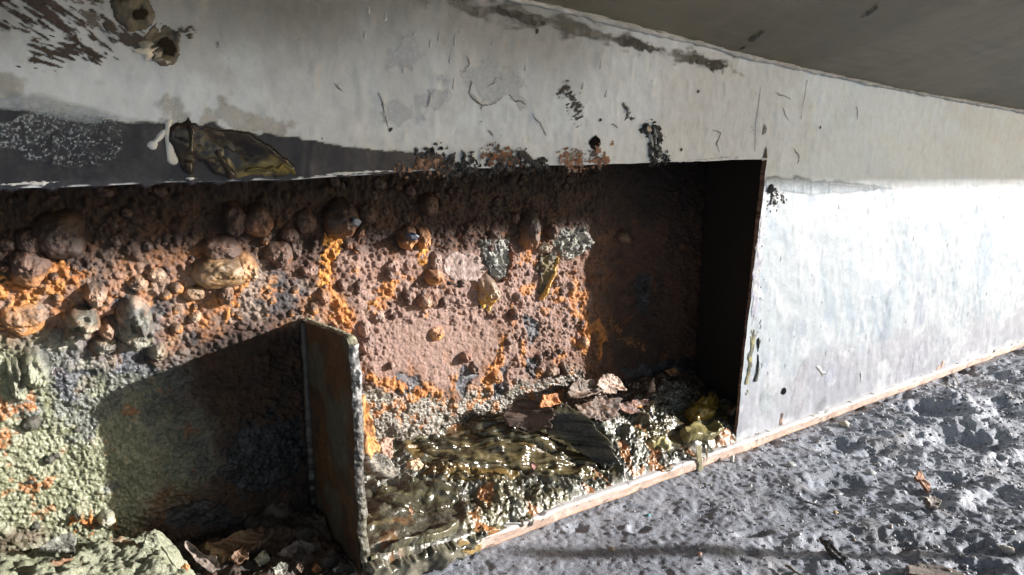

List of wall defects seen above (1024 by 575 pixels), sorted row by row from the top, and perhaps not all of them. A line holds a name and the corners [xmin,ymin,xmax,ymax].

corrosion [0,142,595,404]
corrosion [543,302,649,359]
corrosion [502,348,680,432]
corrosion [20,416,41,432]
corrosion [378,437,393,460]